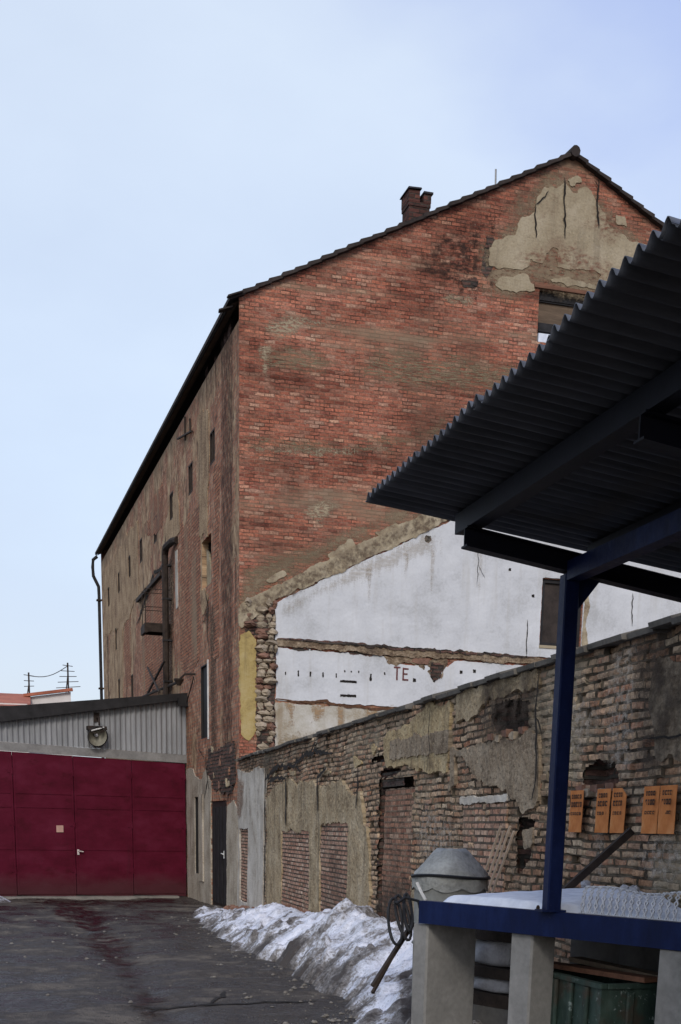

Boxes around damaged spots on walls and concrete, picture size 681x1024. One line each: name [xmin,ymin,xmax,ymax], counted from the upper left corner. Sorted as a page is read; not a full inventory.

crack [534,177,566,237]
flaking render [461,171,646,298]
crack [593,180,601,224]
peeling [328,539,356,559]
spalling [206,597,448,795]
flaking render [265,669,546,917]
spalling [576,759,619,799]